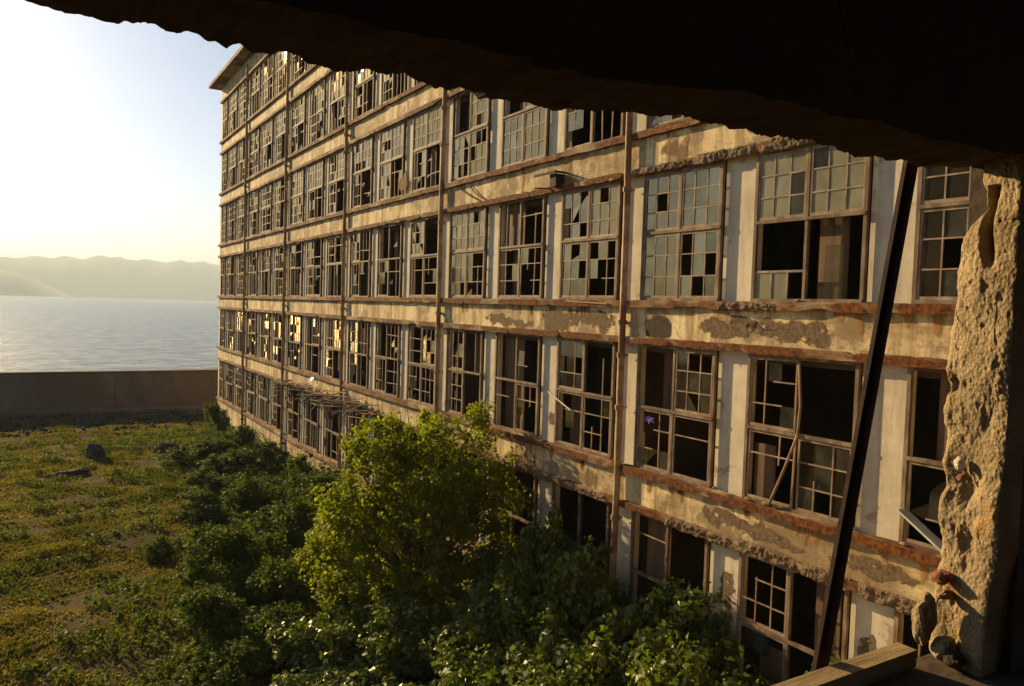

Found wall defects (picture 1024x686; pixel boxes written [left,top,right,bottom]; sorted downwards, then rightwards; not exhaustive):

spalling [635,136,815,175]
peeling [485,306,616,334]
rust [630,338,718,349]
peeling [699,302,834,348]
rust [744,345,801,357]
rust [883,356,934,368]
rust [619,466,836,545]
peeling [664,506,829,585]
rust [851,533,941,582]
peeling [842,555,919,616]